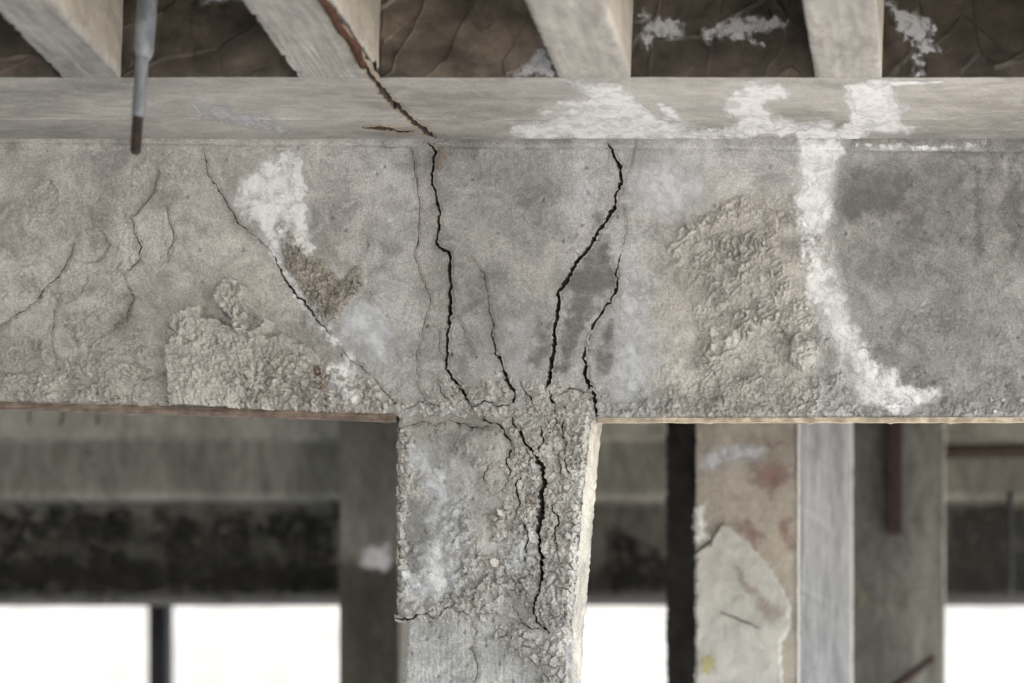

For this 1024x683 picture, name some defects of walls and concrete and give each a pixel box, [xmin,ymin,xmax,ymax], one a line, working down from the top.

crack [0,235,80,369]
crack [87,171,176,347]
leakage [234,151,394,404]
crack [202,18,637,683]
leakage [509,79,953,415]
spalling [361,367,1024,683]